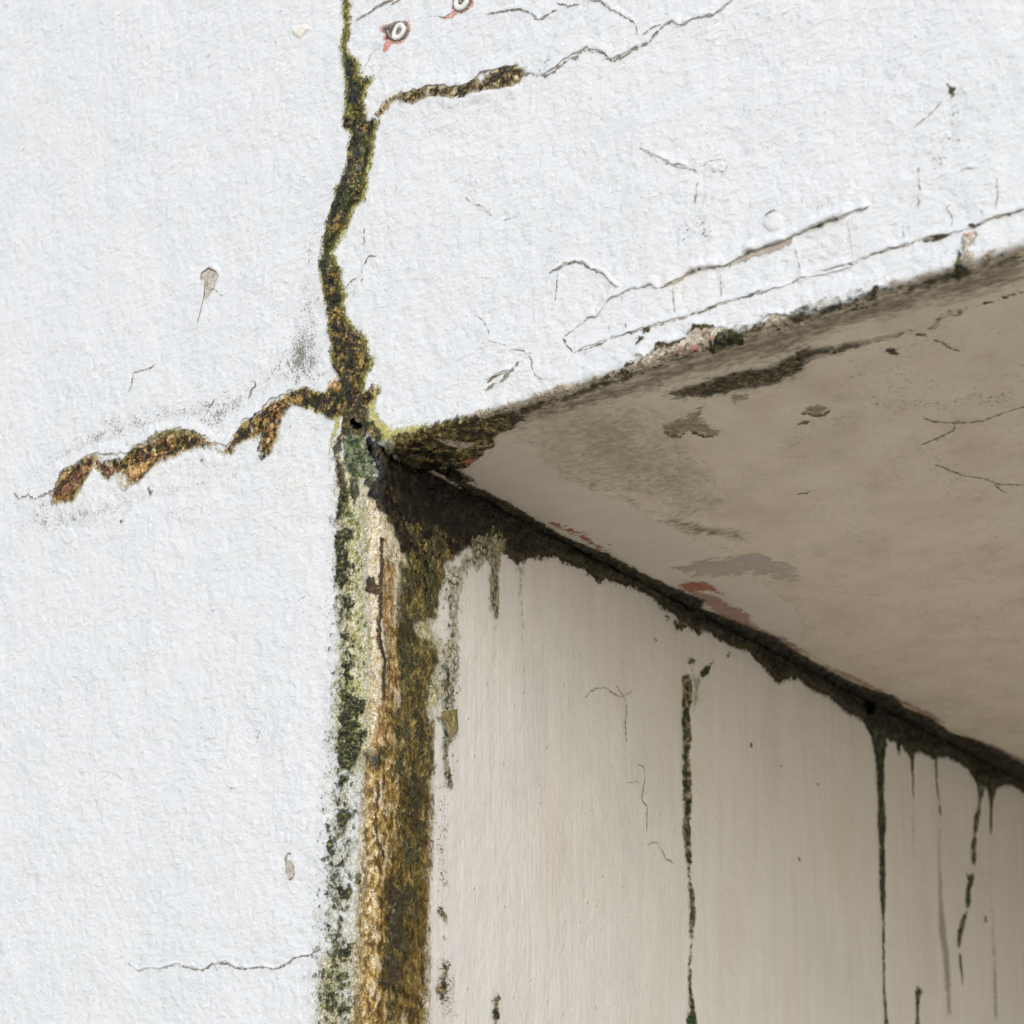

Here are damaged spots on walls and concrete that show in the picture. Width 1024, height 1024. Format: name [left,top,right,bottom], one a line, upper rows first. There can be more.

crack [14,0,732,536]
peeling [473,181,1024,425]
crack [922,406,1024,493]
damp [367,454,1024,1024]
crack [128,945,322,973]